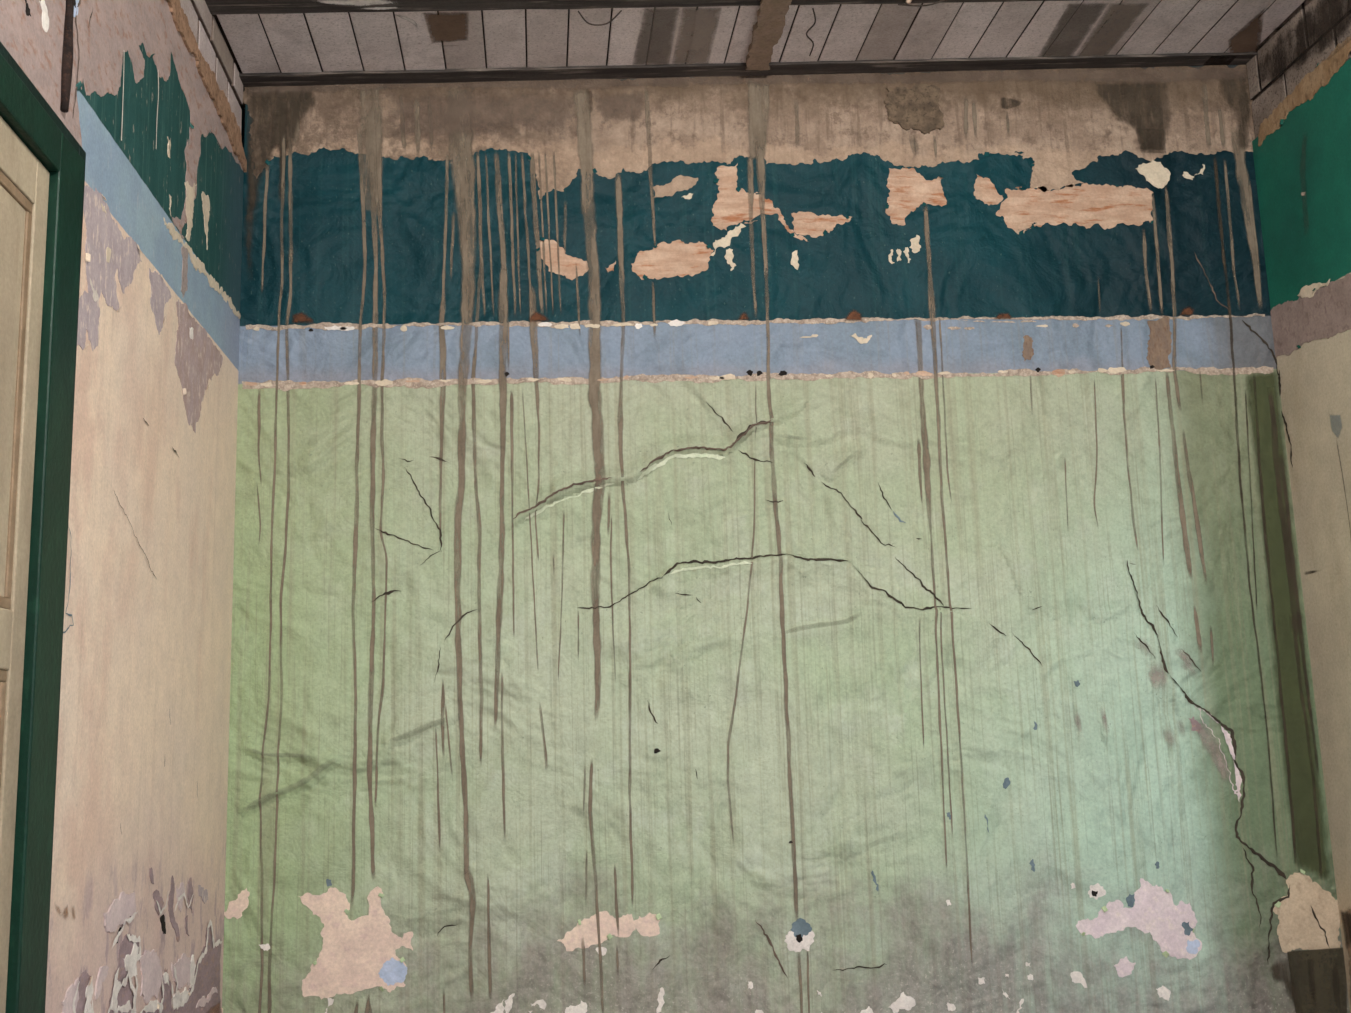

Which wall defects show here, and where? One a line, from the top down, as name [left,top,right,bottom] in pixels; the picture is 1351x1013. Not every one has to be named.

leakage [1260,0,1351,82]
peeling [0,0,1351,433]
leakage [247,4,1270,1013]
crack [578,403,1043,667]
leakage [1228,297,1327,877]
crack [1127,560,1330,961]
peeling [61,867,250,1013]
peeling [299,879,413,1013]
peeling [557,911,662,956]
peeling [1071,861,1202,960]
flaking render [1273,869,1341,953]